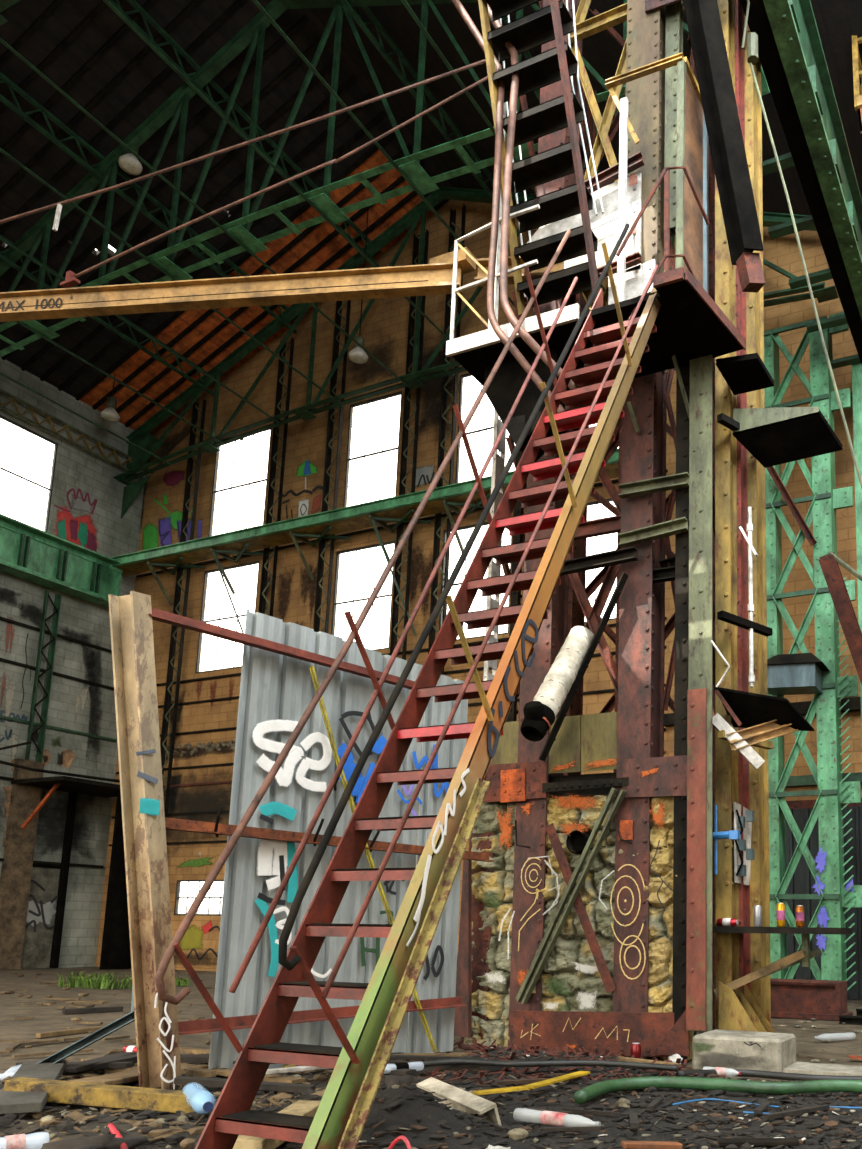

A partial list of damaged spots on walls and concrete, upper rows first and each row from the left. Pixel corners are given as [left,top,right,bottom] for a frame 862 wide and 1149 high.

leakage [0,589,42,628]
leakage [0,684,15,717]
leakage [58,628,101,757]
rust [552,759,617,771]
rust [497,803,533,847]
rust [549,794,598,835]
rust [649,801,666,829]